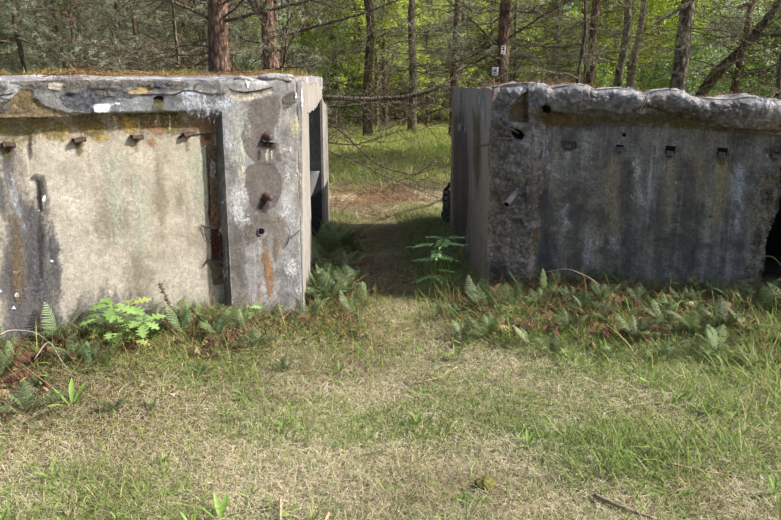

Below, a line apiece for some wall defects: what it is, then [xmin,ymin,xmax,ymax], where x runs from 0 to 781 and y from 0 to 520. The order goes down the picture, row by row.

spalling [508,91,529,123]
leakage [0,146,157,345]
corrosion [259,236,279,302]
leakage [538,135,599,280]
leakage [602,151,750,269]
spalling [748,170,781,292]